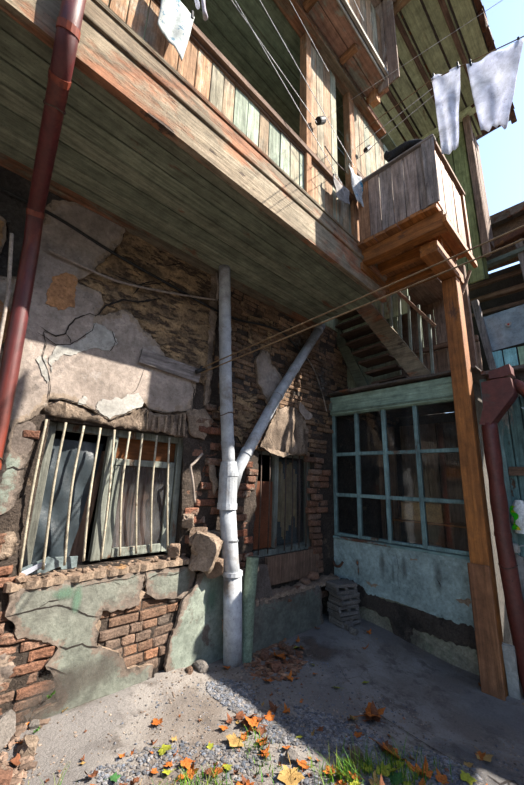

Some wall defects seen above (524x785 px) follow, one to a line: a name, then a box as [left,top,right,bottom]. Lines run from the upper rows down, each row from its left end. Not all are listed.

peeling [0,300,10,344]
crack [37,263,195,420]
peeling [96,393,144,419]
spalling [36,231,219,386]
spalling [0,495,57,727]
crack [7,599,97,617]